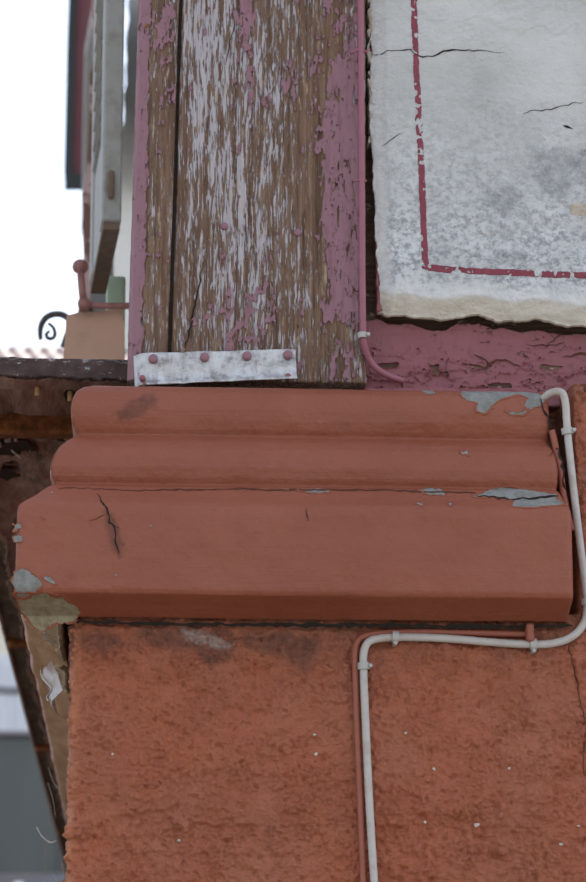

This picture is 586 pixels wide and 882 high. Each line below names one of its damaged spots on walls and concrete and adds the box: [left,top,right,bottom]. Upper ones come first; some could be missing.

peeling [227,0,272,110]
crack [372,45,503,58]
crack [523,102,584,129]
peeling [127,0,176,381]
peeling [280,0,586,417]
peeling [182,248,282,352]
peeling [12,520,24,543]
crack [64,398,566,553]
peeling [471,485,568,509]
peeling [10,567,82,694]
crack [76,619,586,775]